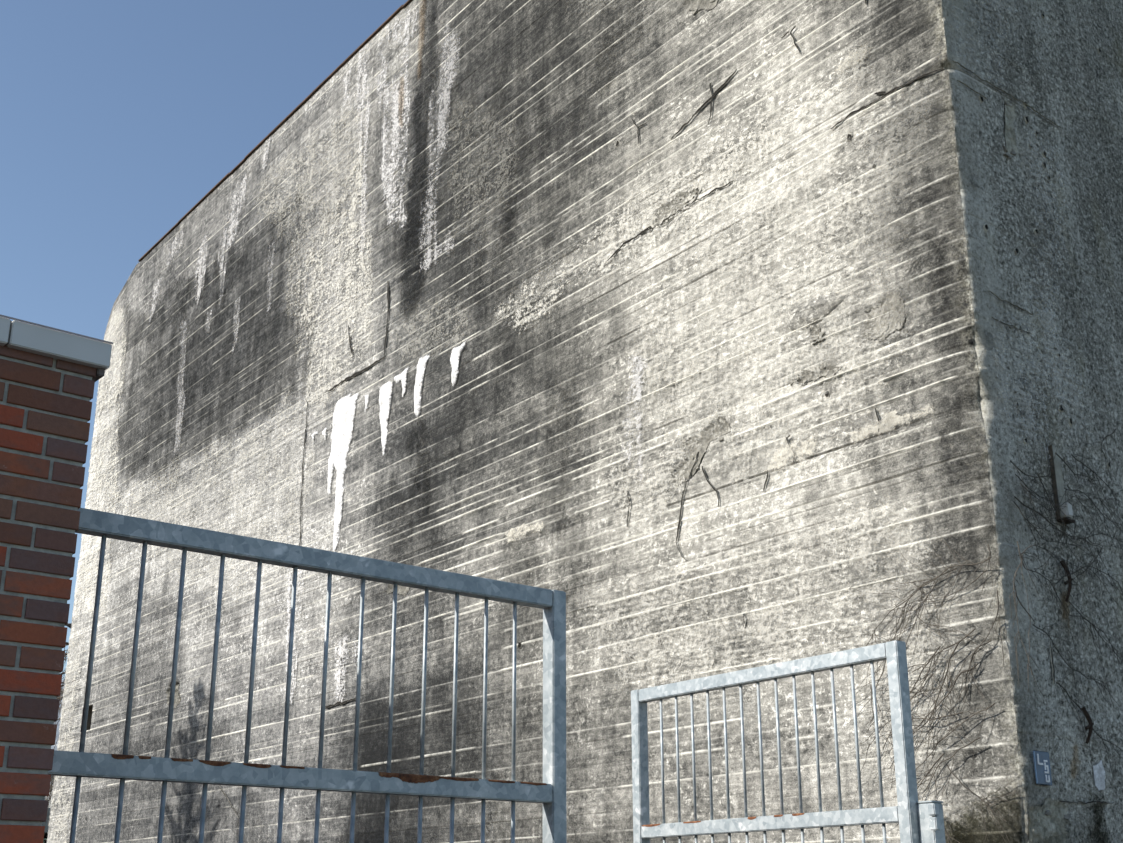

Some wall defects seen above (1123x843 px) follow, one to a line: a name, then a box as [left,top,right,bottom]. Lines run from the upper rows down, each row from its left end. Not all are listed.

damp [343,10,417,256]
damp [195,176,248,303]
damp [420,239,454,270]
crack [675,452,719,560]